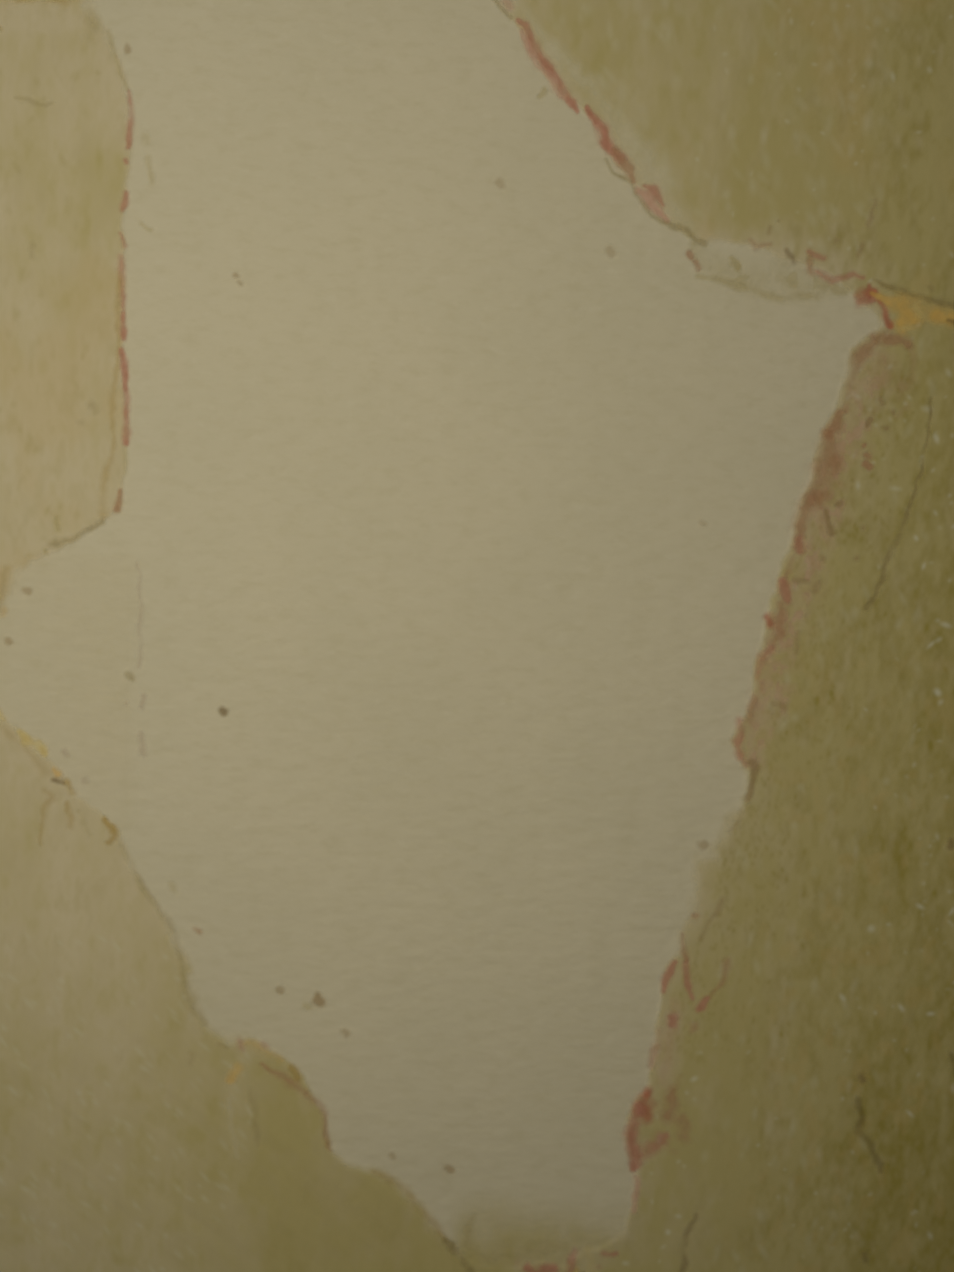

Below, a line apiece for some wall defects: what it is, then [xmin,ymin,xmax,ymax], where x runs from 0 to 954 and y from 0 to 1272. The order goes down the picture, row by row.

peeling [516,18,579,113]
peeling [585,105,635,184]
flaking render [856,284,920,331]
crack [876,280,954,324]
peeling [119,348,129,446]
peeling [0,518,145,849]